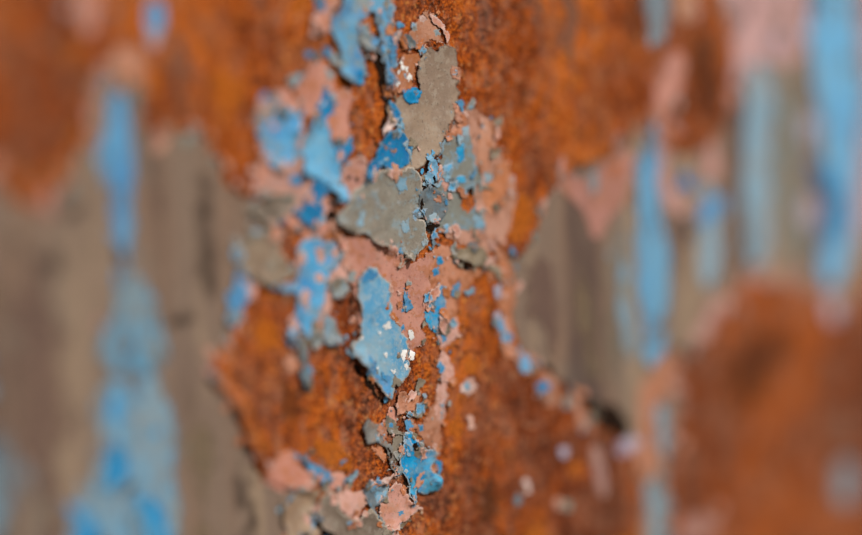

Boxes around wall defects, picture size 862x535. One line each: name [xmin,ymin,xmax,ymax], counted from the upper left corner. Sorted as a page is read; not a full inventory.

corrosion [0,0,420,219]
peeling [225,0,600,535]
corrosion [204,0,739,535]
peeling [590,445,608,498]